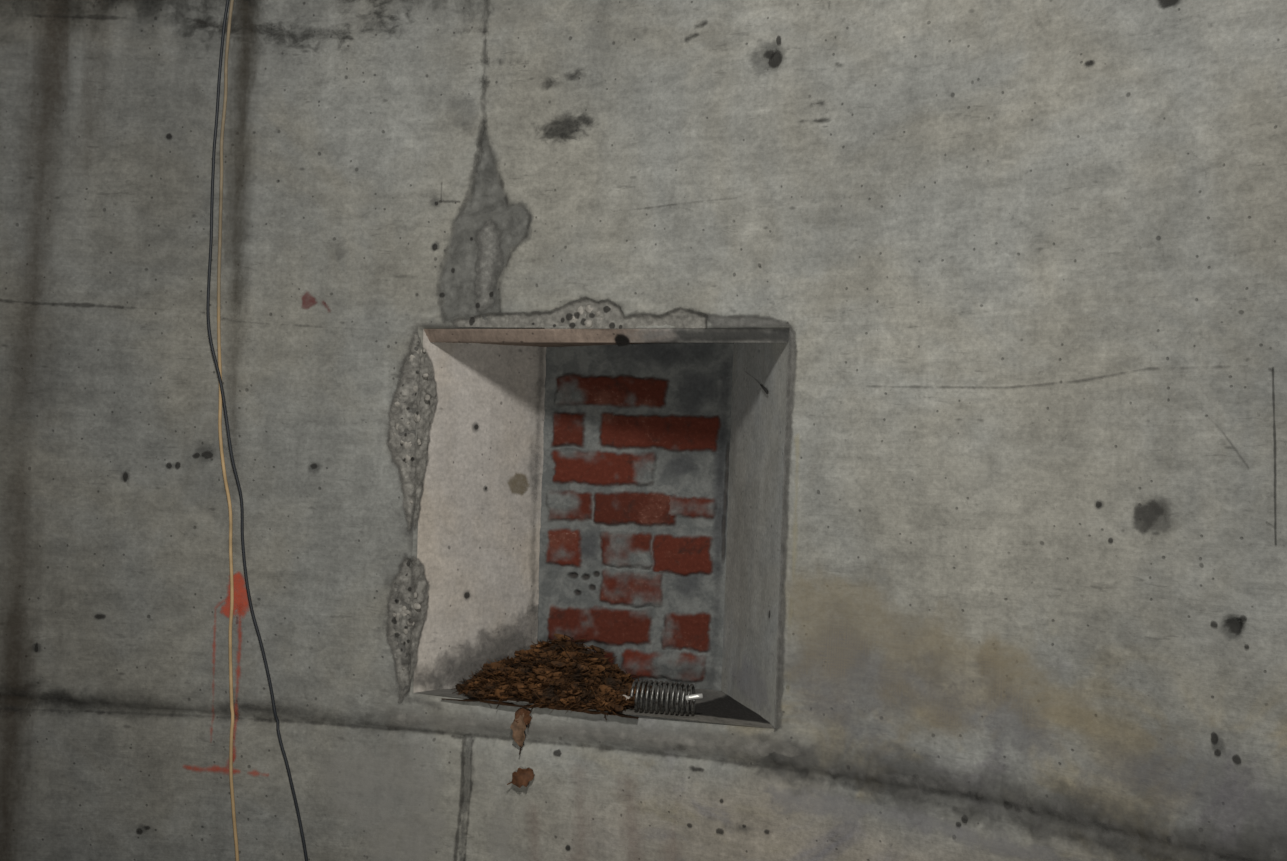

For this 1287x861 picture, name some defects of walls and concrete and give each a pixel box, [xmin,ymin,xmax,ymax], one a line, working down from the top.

spalling [388,333,438,530]
peeling [432,127,796,730]
spalling [387,557,429,702]